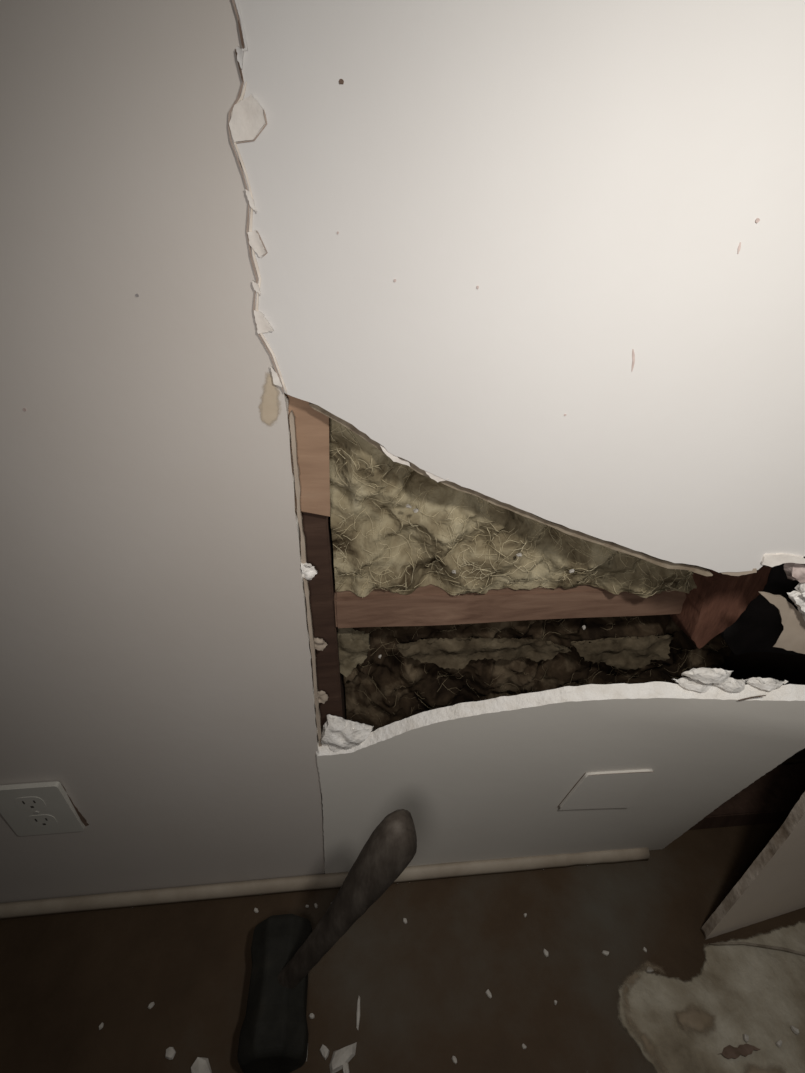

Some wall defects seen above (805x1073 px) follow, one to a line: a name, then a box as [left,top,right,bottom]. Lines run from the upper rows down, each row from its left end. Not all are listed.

crack [228,0,287,394]
peeling [380,444,410,466]
spalling [721,553,805,654]